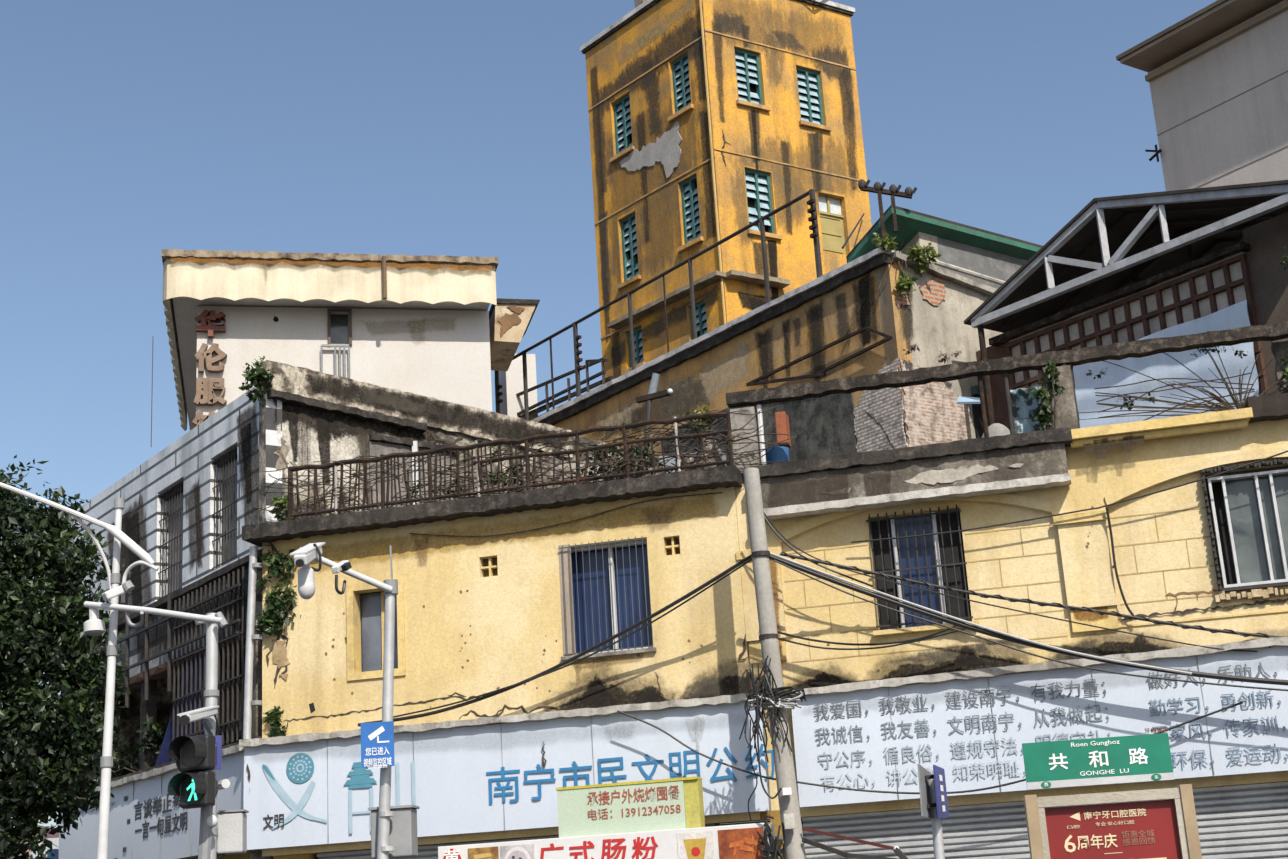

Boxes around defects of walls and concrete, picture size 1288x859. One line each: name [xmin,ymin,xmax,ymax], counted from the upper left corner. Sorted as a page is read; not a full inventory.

water stain [775,32,858,192]
peeling [620,122,682,179]
water stain [591,0,749,379]
water stain [738,141,792,310]
flaking render [895,277,946,308]
peeling [498,306,525,338]
water stain [272,374,569,488]
water stain [237,404,259,525]
peeling [904,463,1023,485]
water stain [546,661,765,711]
water stain [785,666,856,691]
water stain [872,642,1028,680]